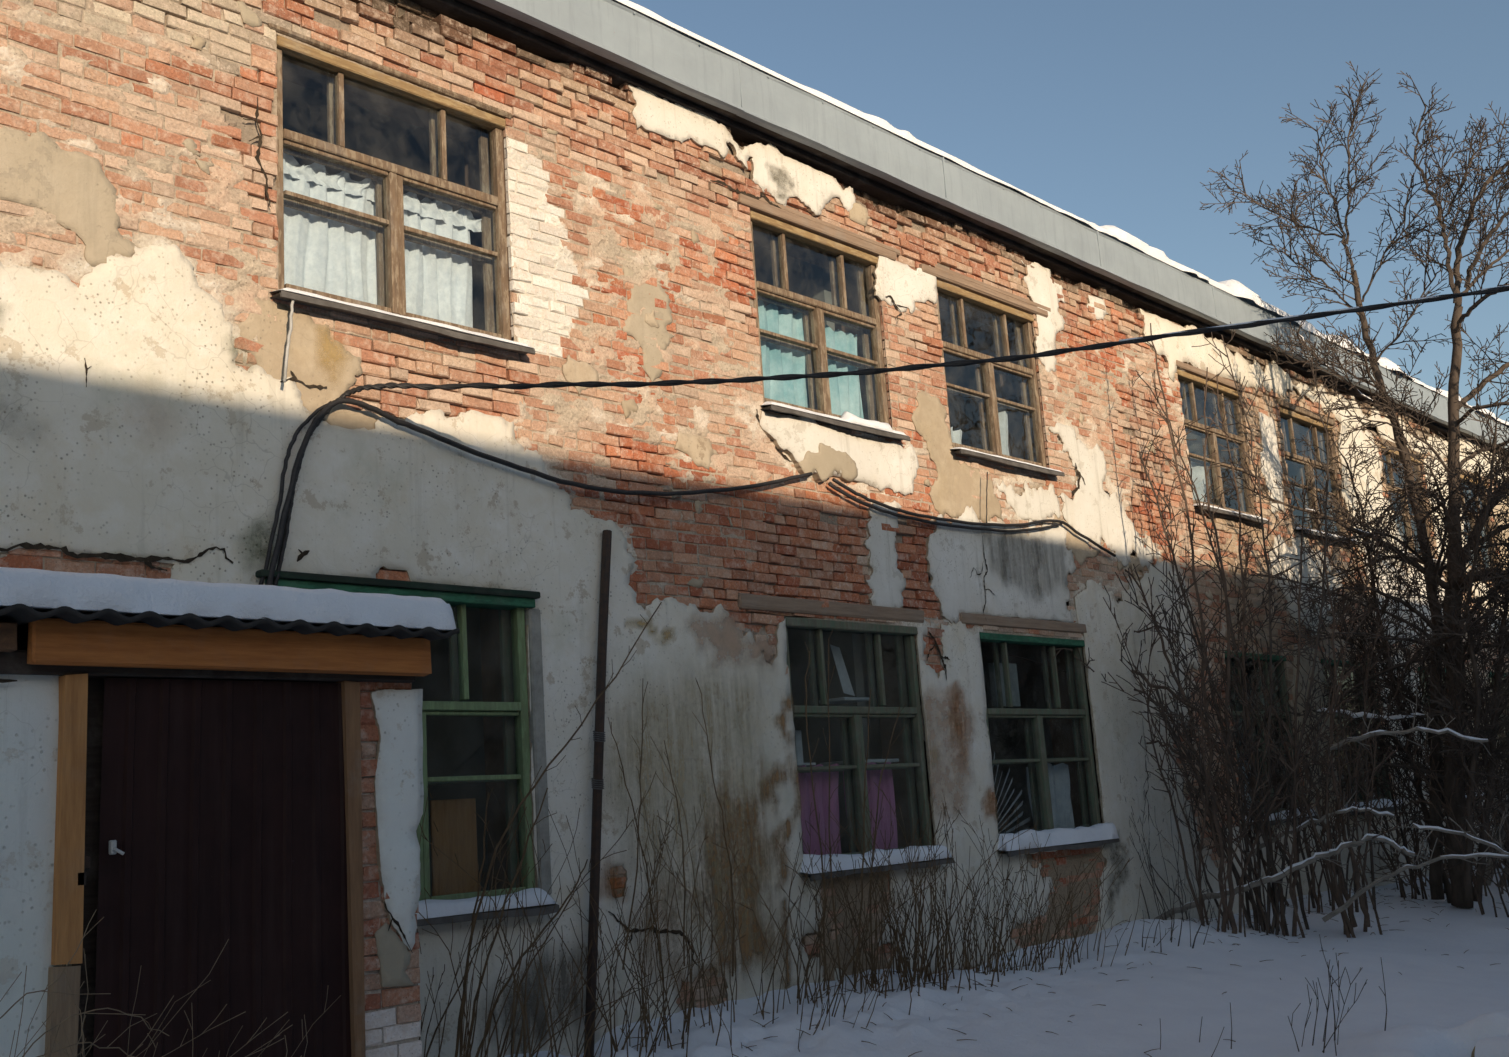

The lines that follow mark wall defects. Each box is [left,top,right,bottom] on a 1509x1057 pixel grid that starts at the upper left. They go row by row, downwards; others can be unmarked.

spalling [0,0,405,430]
peeling [628,84,870,227]
crack [0,542,233,571]
spalling [503,107,1241,868]
leakage [619,693,802,987]